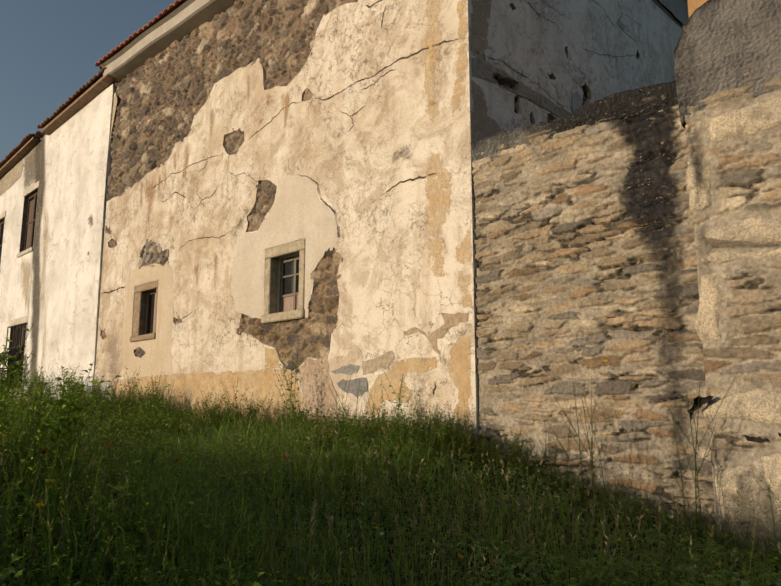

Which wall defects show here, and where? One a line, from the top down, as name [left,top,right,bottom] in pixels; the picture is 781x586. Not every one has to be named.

flaking render [106,0,358,201]
crack [246,38,567,141]
peeling [450,0,592,145]
crack [153,154,222,208]
spalling [245,180,277,232]
crack [296,174,339,242]
crack [382,173,436,195]
peeling [425,155,451,277]
leakage [606,100,682,394]
leakage [690,139,700,187]
peeling [98,218,472,430]
peeling [687,395,714,420]